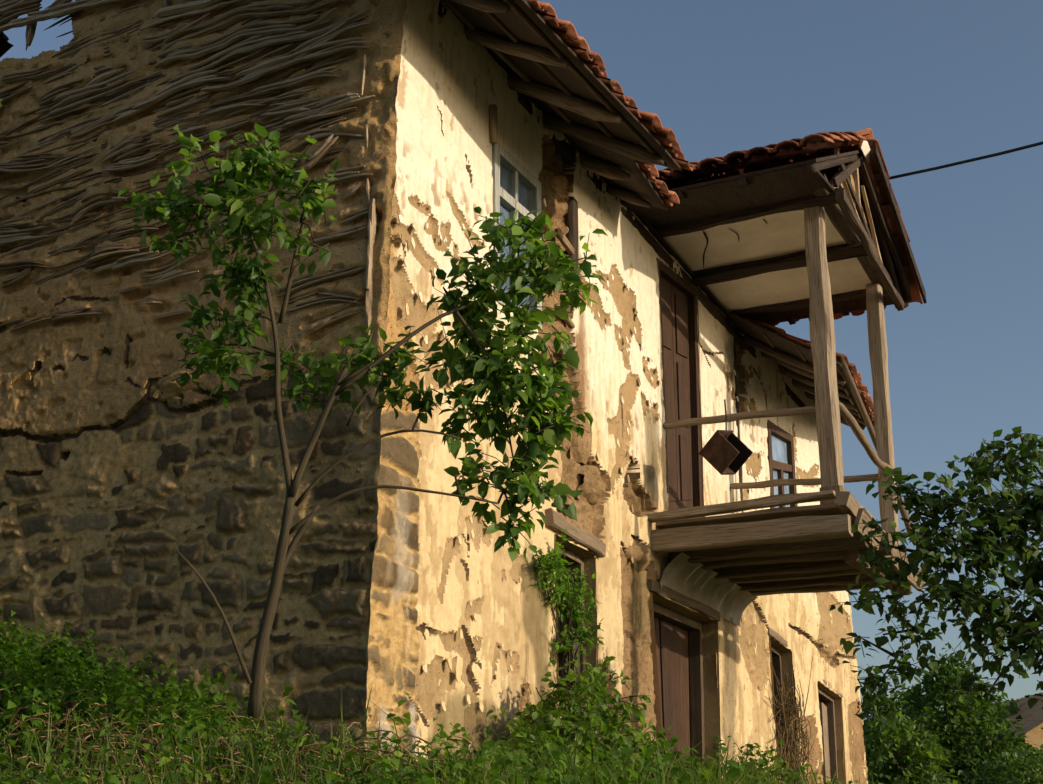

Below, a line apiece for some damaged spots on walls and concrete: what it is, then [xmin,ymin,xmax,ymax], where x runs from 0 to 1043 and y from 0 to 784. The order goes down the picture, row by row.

spalling [537,133,578,272]
peeling [381,190,486,415]
crack [0,334,262,444]
spalling [538,263,662,542]
crack [5,469,44,478]
peeling [437,514,492,604]
peeling [501,553,528,584]
peeling [414,595,533,749]